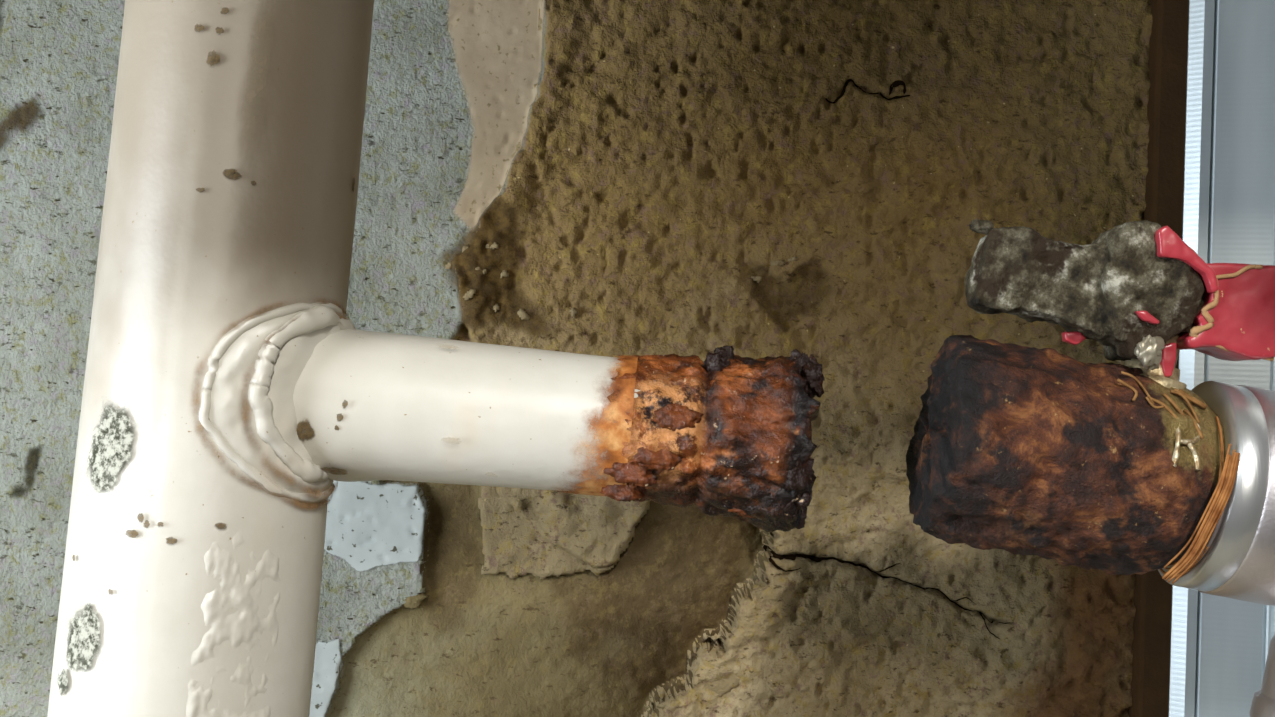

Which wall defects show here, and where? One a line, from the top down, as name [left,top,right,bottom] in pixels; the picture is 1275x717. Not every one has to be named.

damp [0,101,39,146]
peeling [444,0,546,335]
spalling [309,467,774,717]
crack [763,545,1007,639]